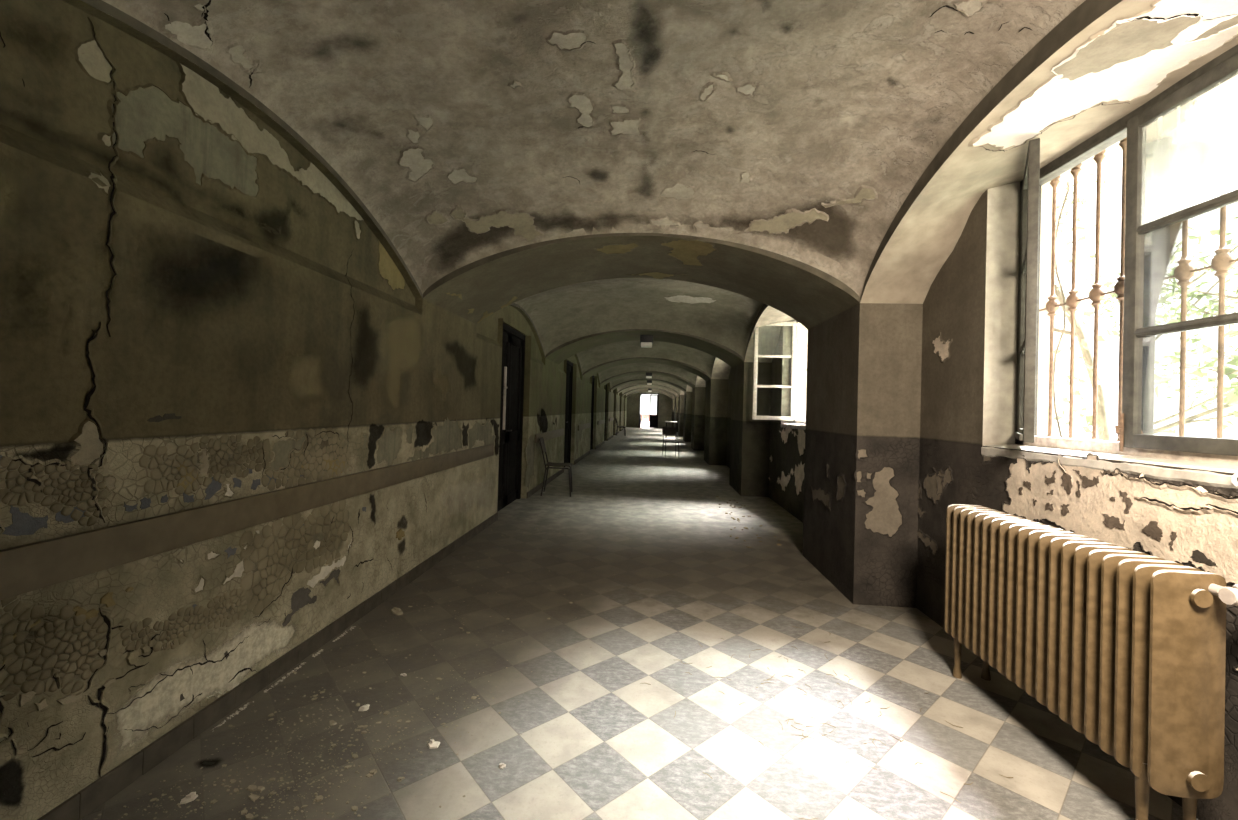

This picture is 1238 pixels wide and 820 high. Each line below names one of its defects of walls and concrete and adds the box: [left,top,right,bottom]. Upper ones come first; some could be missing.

peeling [158,0,215,50]
peeling [74,38,364,240]
peeling [566,39,642,136]
peeling [968,0,1238,150]
crack [0,17,119,526]
peeling [449,204,544,243]
peeling [66,418,106,468]
crack [0,254,399,778]
peeling [281,530,354,628]
peeling [361,417,496,467]
peeling [768,423,954,557]
peeling [1002,453,1238,586]